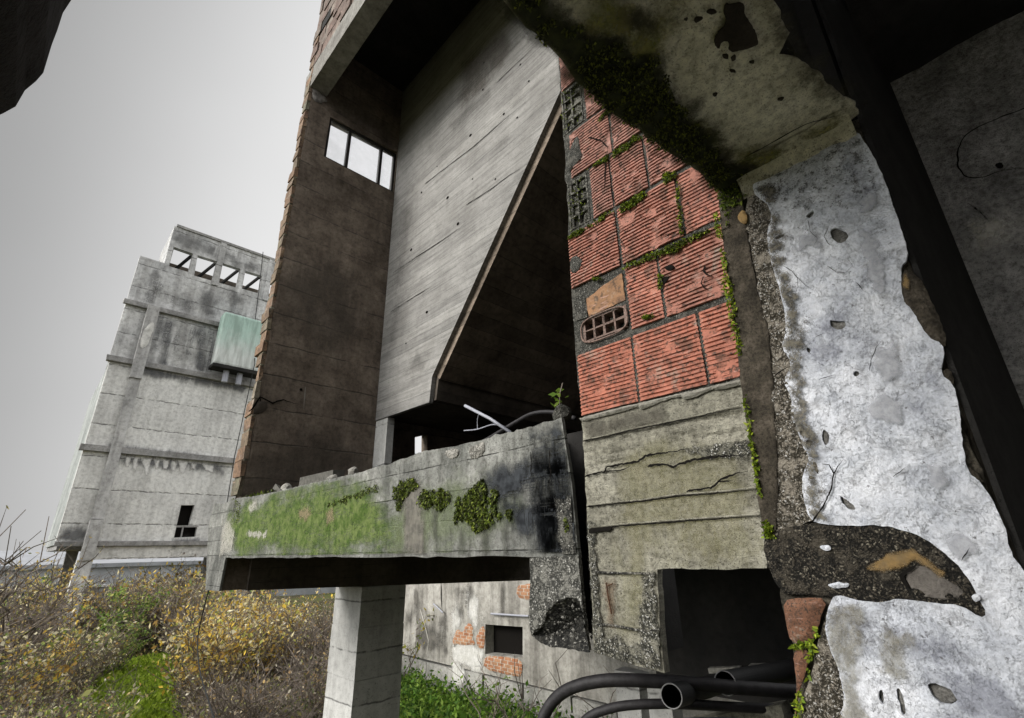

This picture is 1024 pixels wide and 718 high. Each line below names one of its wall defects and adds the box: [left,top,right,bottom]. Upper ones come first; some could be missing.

spalling [253,401,267,414]
crack [249,396,295,414]
damp [124,446,220,475]
damp [486,427,575,552]
crack [585,448,747,492]
crack [812,460,843,523]
spalling [533,521,661,671]
flaking render [763,523,985,718]
flaking render [453,623,523,677]